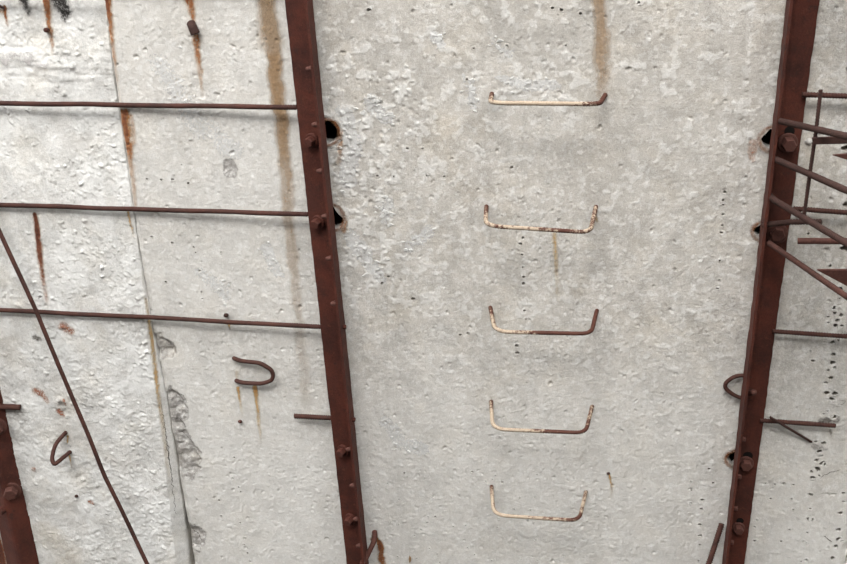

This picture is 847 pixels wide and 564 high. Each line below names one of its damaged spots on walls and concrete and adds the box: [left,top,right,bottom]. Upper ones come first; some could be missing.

rust [42,0,54,45]
rust [193,34,201,70]
spalling [0,54,297,160]
rust [121,109,133,167]
spalling [0,203,308,217]
rust [32,212,44,283]
spalling [0,228,321,564]
spalling [294,413,331,421]
rust [371,537,386,564]